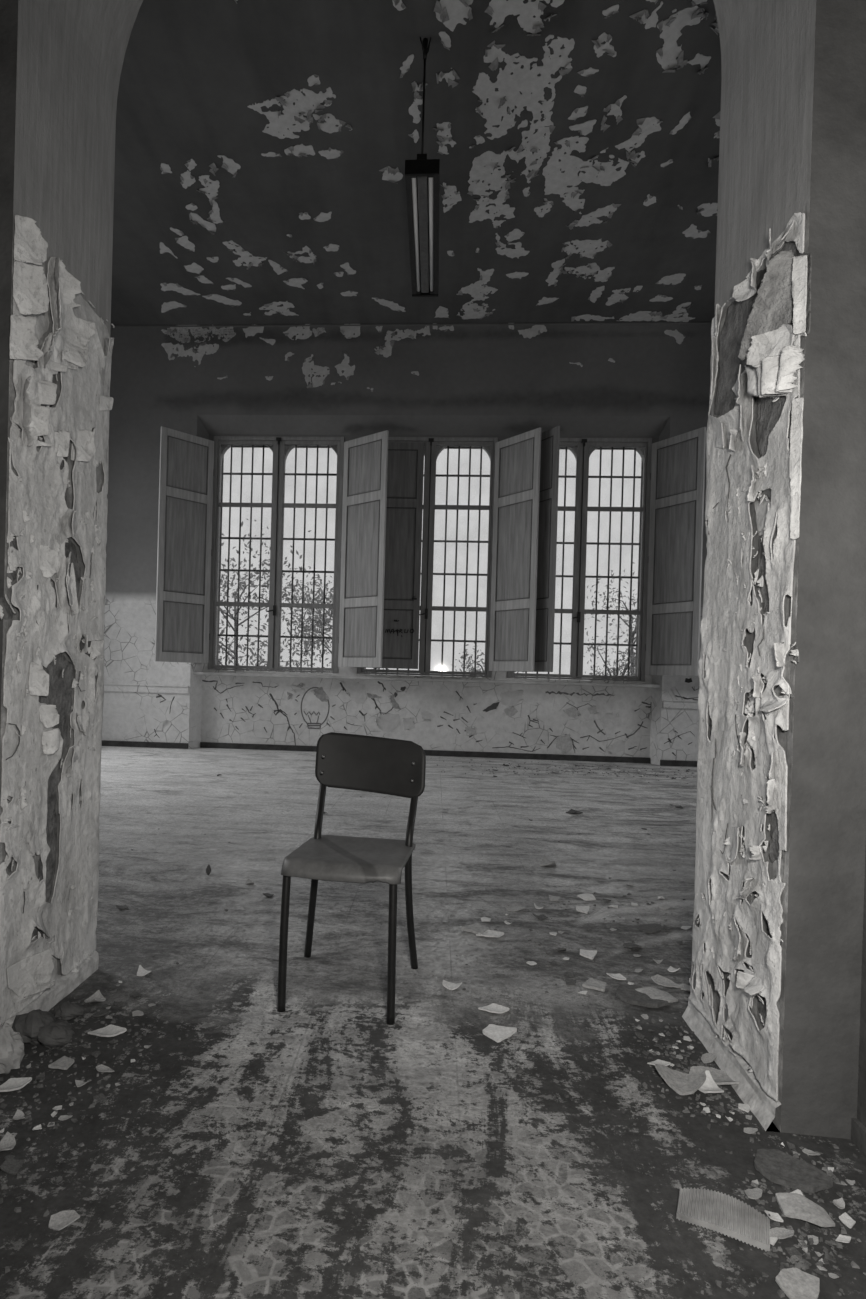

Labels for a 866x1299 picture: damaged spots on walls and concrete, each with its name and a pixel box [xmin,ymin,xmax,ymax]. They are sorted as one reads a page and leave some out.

peeling [247,74,352,159]
peeling [374,0,711,358]
peeling [678,202,718,239]
peeling [160,155,406,388]
peeling [0,215,114,1026]
crack [202,680,299,745]
peeling [287,682,329,702]
crack [340,681,394,730]
peeling [367,686,432,730]
peeling [483,702,518,717]
peeling [688,212,812,1102]
crack [437,687,739,854]